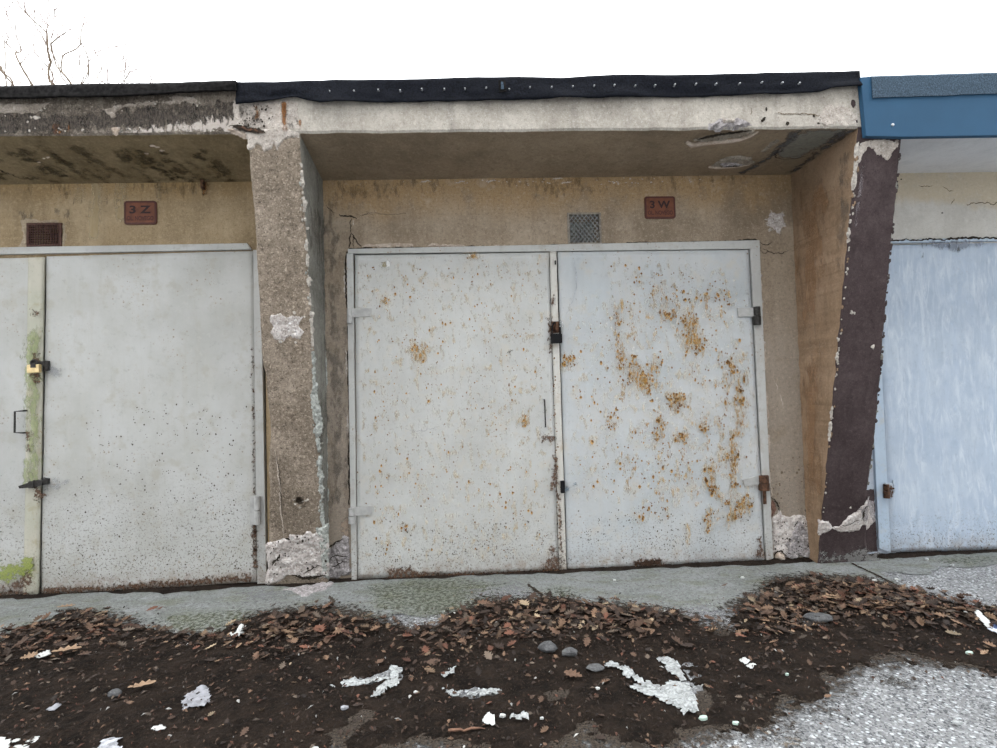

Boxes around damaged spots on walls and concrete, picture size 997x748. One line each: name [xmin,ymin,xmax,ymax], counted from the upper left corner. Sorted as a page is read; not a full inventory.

leakage [125,100,242,133]
spalling [685,118,758,148]
leakage [9,146,207,238]
peeling [834,139,901,390]
crack [893,234,997,242]
spalling [264,163,351,597]
corrosion [370,313,482,403]
corrosion [547,317,582,367]
corrosion [387,376,565,578]
spalling [769,457,876,560]
corrosion [41,525,259,594]
corrosion [633,557,664,567]